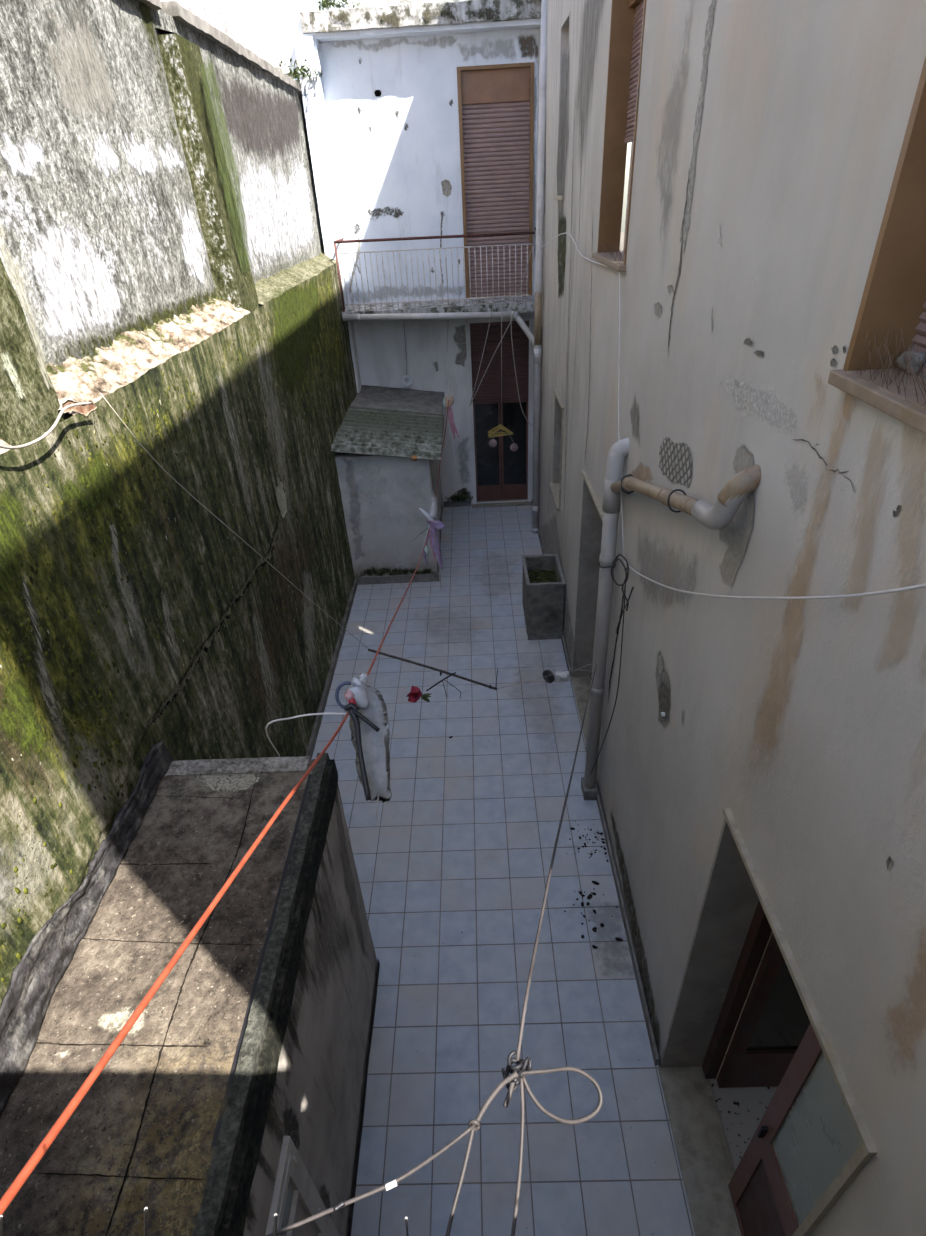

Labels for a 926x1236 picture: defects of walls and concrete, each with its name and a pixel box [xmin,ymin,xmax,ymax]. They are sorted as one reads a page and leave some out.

water stain [519,36,538,58]
crack [668,0,716,354]
water stain [0,224,120,389]
water stain [219,376,252,520]
water stain [256,346,293,533]
crack [792,439,854,492]
water stain [110,524,133,633]
water stain [23,576,58,730]
water stain [253,614,277,713]
flaking render [657,655,670,721]
water stain [194,773,260,793]
water stain [284,1108,300,1151]